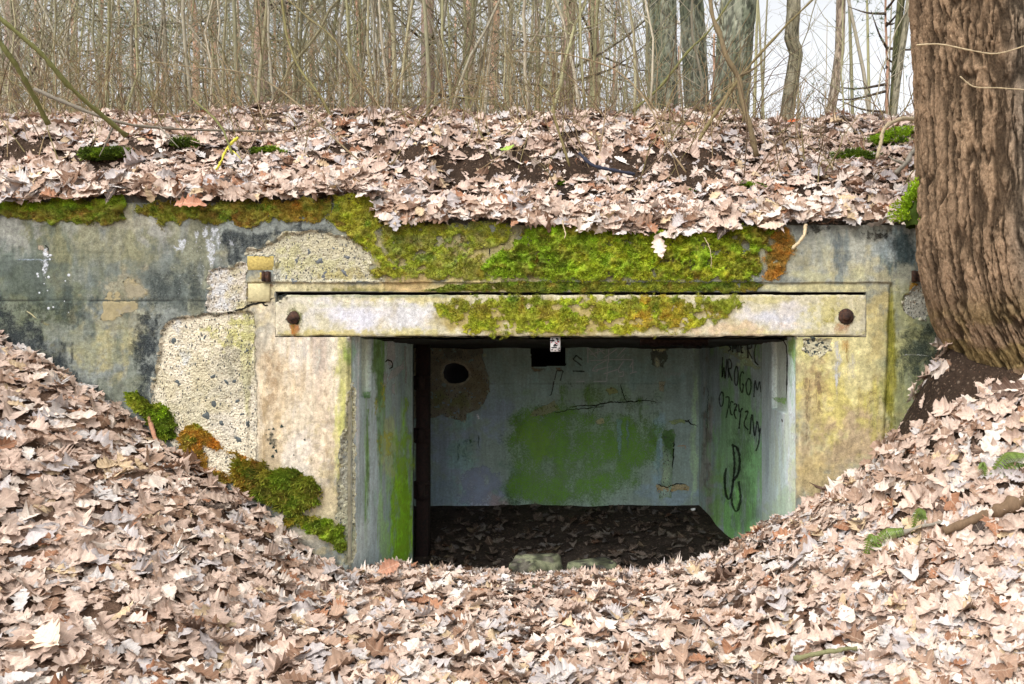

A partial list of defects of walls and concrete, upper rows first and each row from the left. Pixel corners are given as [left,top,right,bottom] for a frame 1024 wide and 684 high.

spalling [150,229,385,477]
flaking render [409,337,490,423]
crack [555,385,657,413]